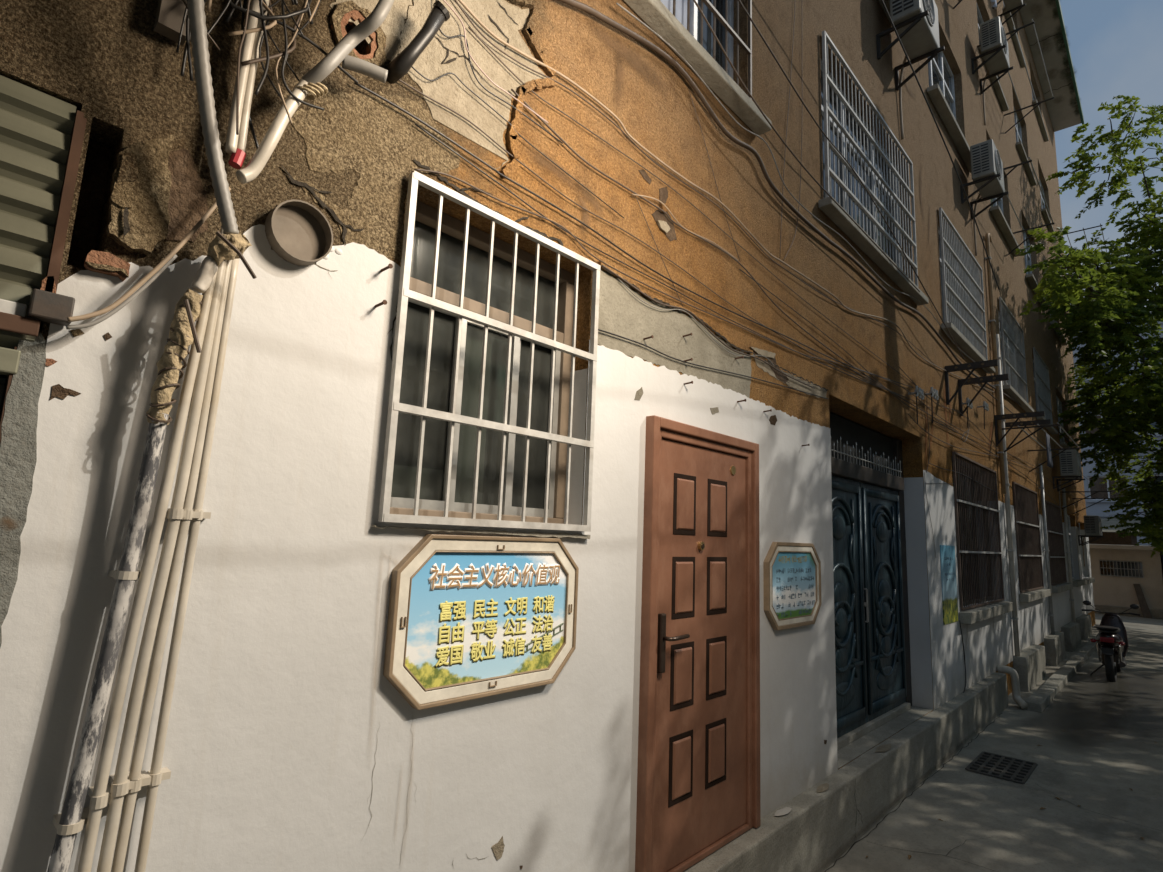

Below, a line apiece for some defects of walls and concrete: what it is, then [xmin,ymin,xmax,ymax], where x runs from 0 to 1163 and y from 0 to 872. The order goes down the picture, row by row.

peeling [281,0,556,261]
spalling [67,133,209,282]
spalling [40,276,56,293]
spalling [50,384,81,400]
peeling [598,261,827,399]
spalling [492,836,505,860]